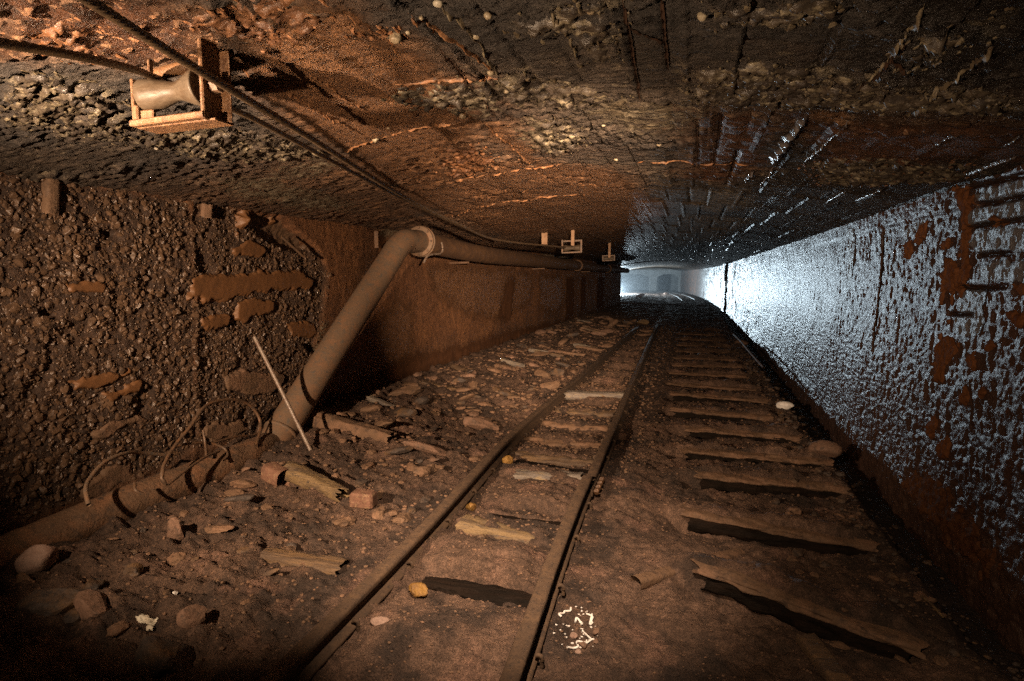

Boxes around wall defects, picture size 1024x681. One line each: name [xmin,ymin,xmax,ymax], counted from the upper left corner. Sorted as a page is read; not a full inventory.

spalling [885,25,973,74]
spalling [380,71,634,156]
spalling [682,57,1022,120]
peeling [931,319,996,383]
peeling [1005,310,1024,329]